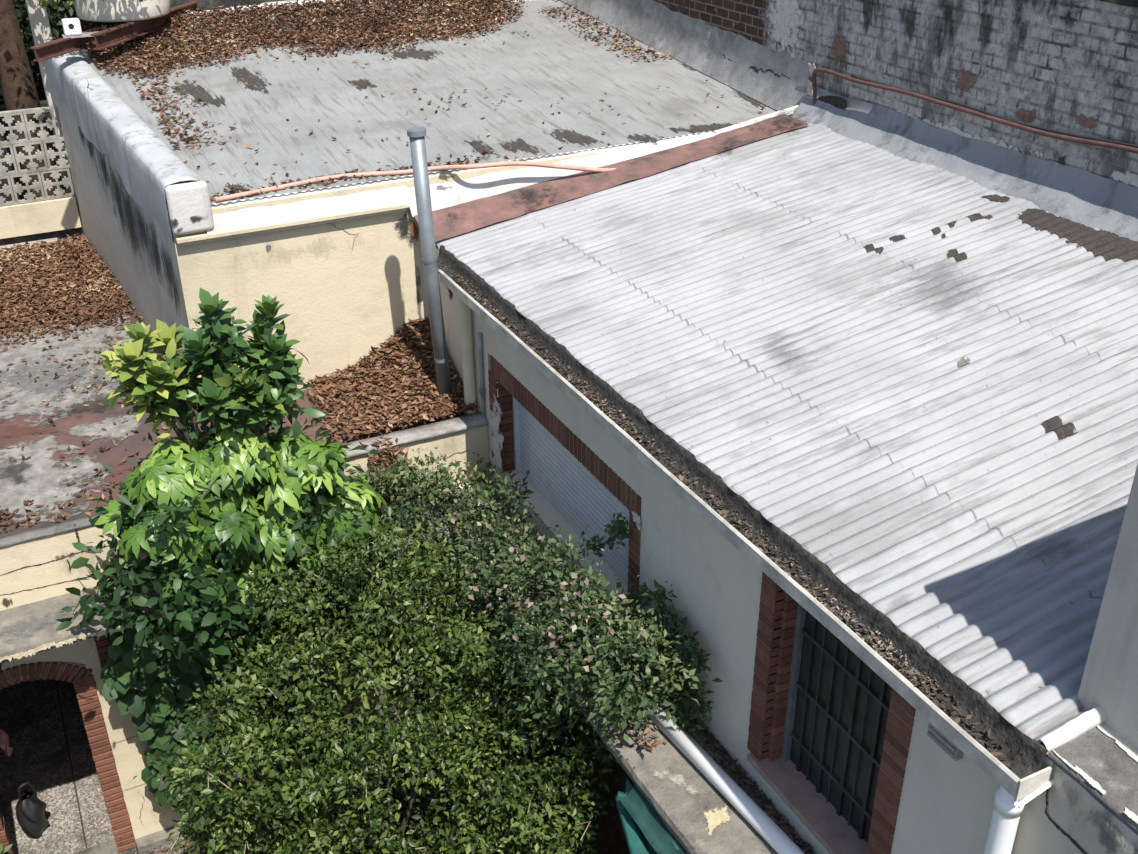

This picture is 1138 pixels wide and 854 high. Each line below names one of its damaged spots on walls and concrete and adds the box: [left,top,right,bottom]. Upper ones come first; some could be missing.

damp [861,0,876,31]
damp [899,6,916,41]
damp [979,0,997,51]
damp [817,95,848,110]
damp [78,126,179,319]
crack [0,524,116,596]
peeling [0,621,136,662]
peeling [1096,723,1138,763]
peeling [1052,749,1106,795]
peeling [704,807,730,835]
crack [1045,789,1086,854]
peeling [1123,808,1138,824]